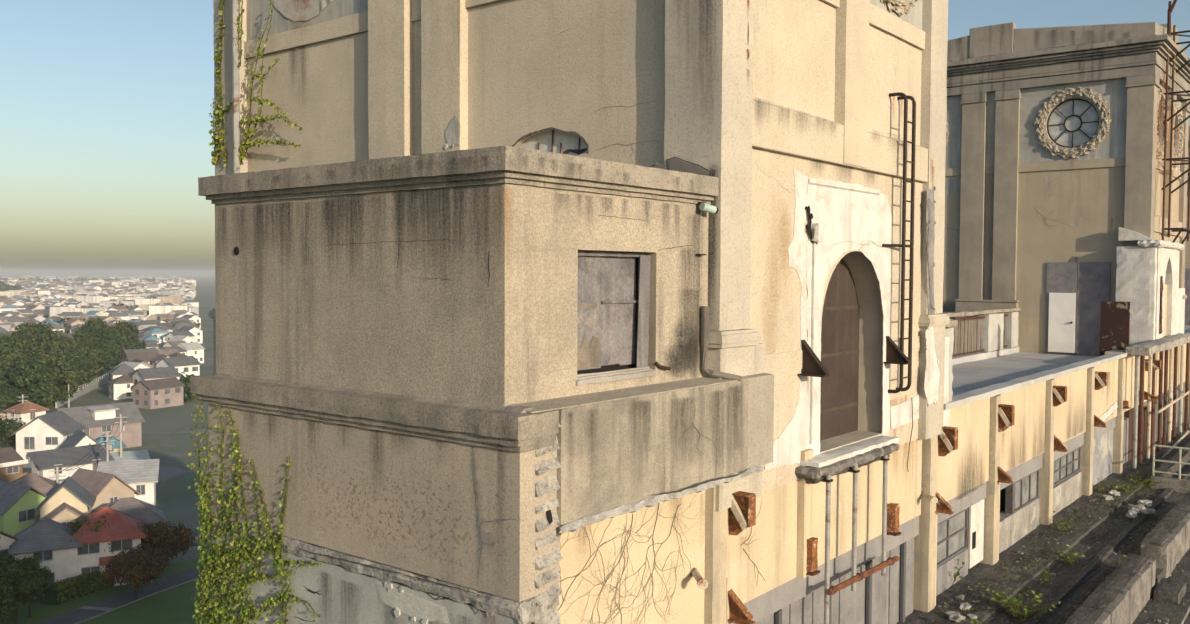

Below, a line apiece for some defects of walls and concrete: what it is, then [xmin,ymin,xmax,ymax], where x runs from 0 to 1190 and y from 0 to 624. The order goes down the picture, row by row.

spalling [805,206,818,245]
leakage [669,324,698,376]
crack [299,445,518,614]
spalling [516,424,764,624]
peeling [375,581,450,624]